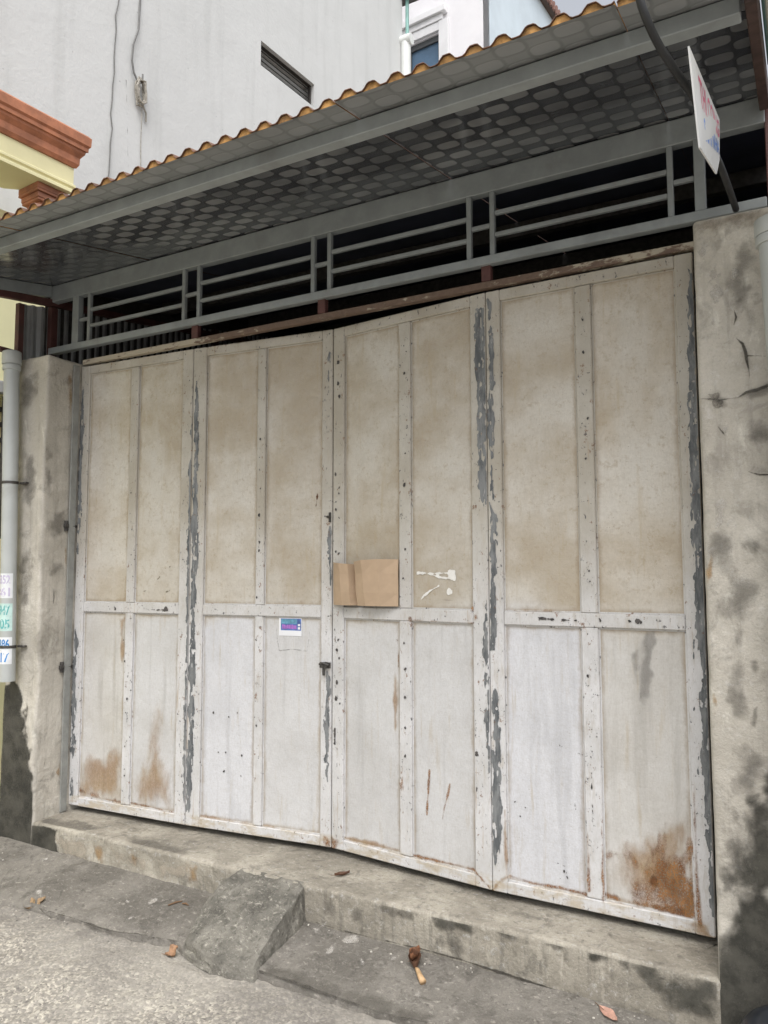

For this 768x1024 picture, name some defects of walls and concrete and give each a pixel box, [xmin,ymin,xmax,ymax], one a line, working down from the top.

crack [711,313,768,401]
peeling [182,374,199,813]
peeling [473,298,526,865]
peeling [686,269,715,918]
rust [630,841,708,935]